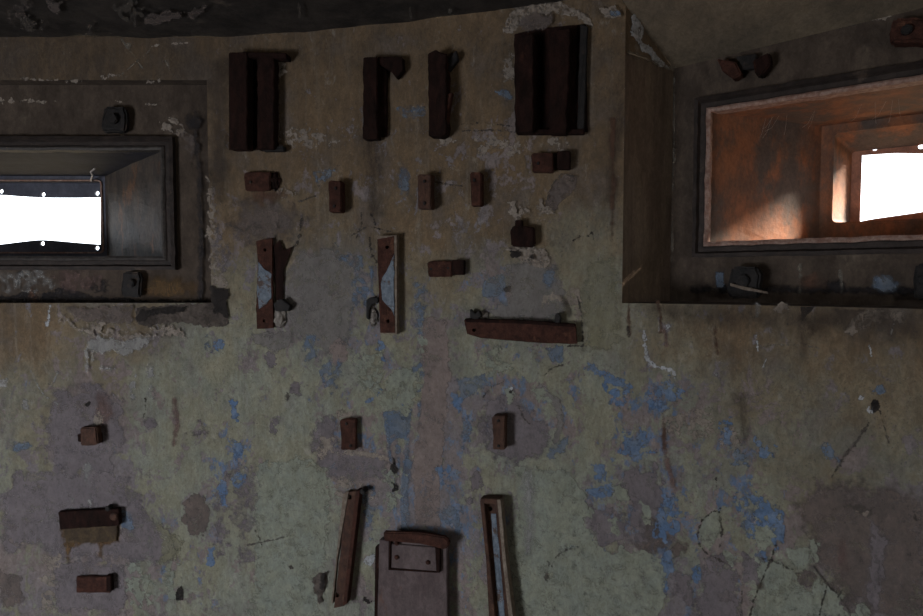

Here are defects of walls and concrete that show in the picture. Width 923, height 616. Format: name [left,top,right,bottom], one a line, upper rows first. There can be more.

peeling [113,0,206,27]
peeling [502,1,593,34]
spalling [599,5,674,71]
peeling [583,363,634,407]
crack [831,410,890,478]
crack [696,477,724,563]
crack [740,544,850,616]